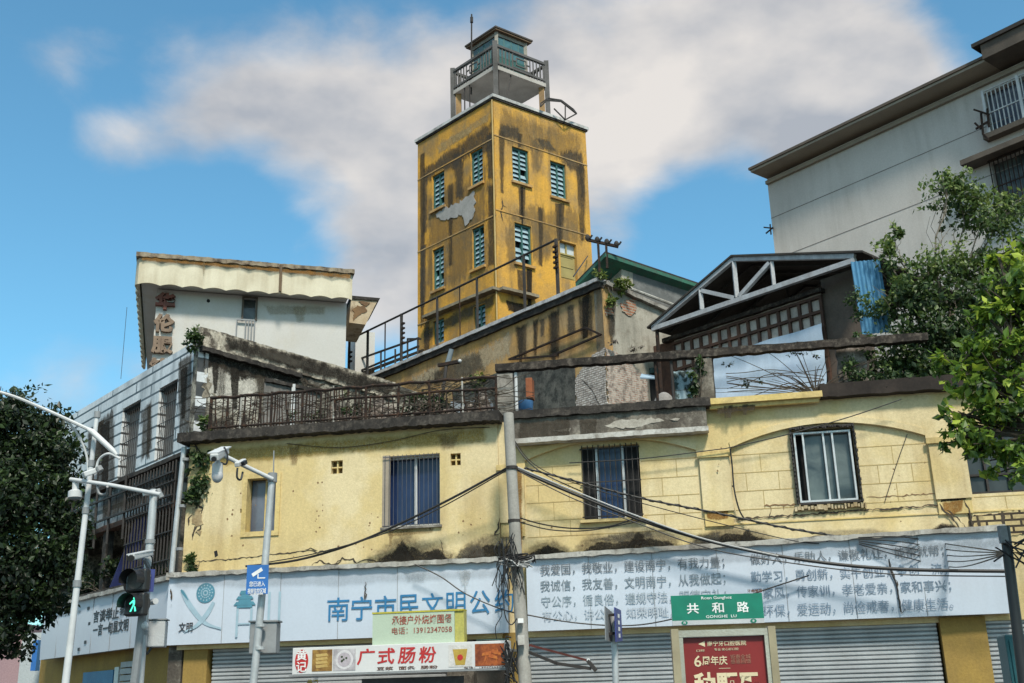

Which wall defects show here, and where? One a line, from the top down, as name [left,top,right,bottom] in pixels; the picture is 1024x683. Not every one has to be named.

peeling [436,191,476,226]
leakage [420,115,543,351]
leakage [537,139,585,240]
peeling [352,301,370,321]
leakage [409,294,593,387]
leakage [178,337,393,433]
peeling [605,417,680,429]
leakage [375,534,509,593]
leakage [523,541,568,556]
leakage [581,530,677,551]